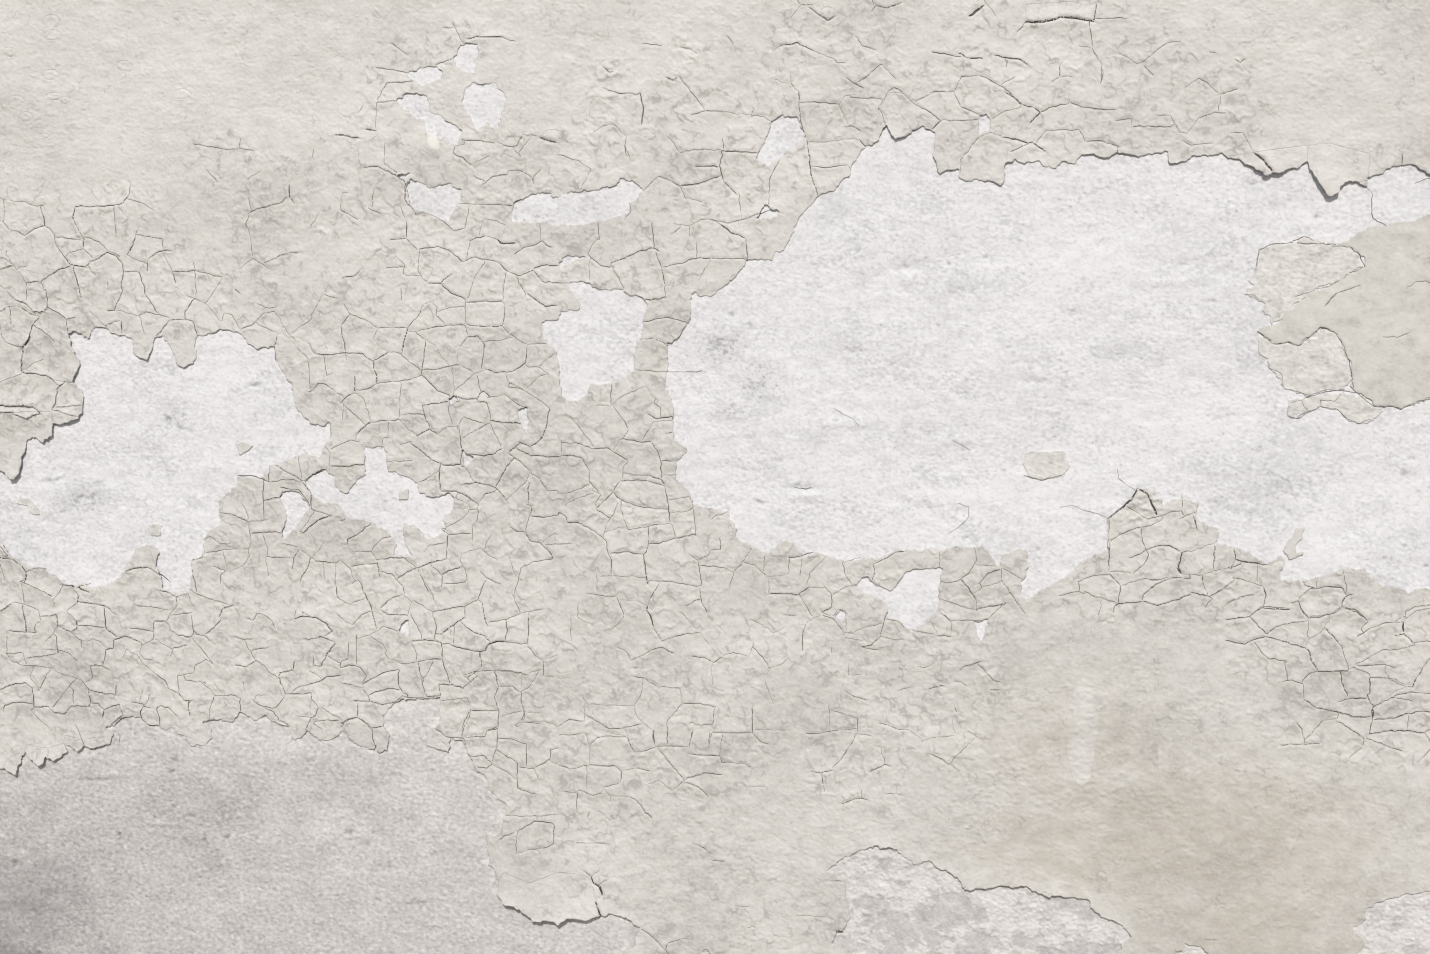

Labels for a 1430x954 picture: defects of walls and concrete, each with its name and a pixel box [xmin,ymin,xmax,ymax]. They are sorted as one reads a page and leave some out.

crack [436,24,516,65]
crack [773,0,1273,195]
peeling [511,178,643,226]
peeling [542,281,648,402]
peeling [665,93,1430,599]
crack [1246,236,1430,424]
peeling [0,319,454,595]
crack [0,43,1026,915]
peeling [857,567,942,632]
crack [1024,469,1430,762]
peeling [0,697,669,954]
peeling [828,845,1131,954]